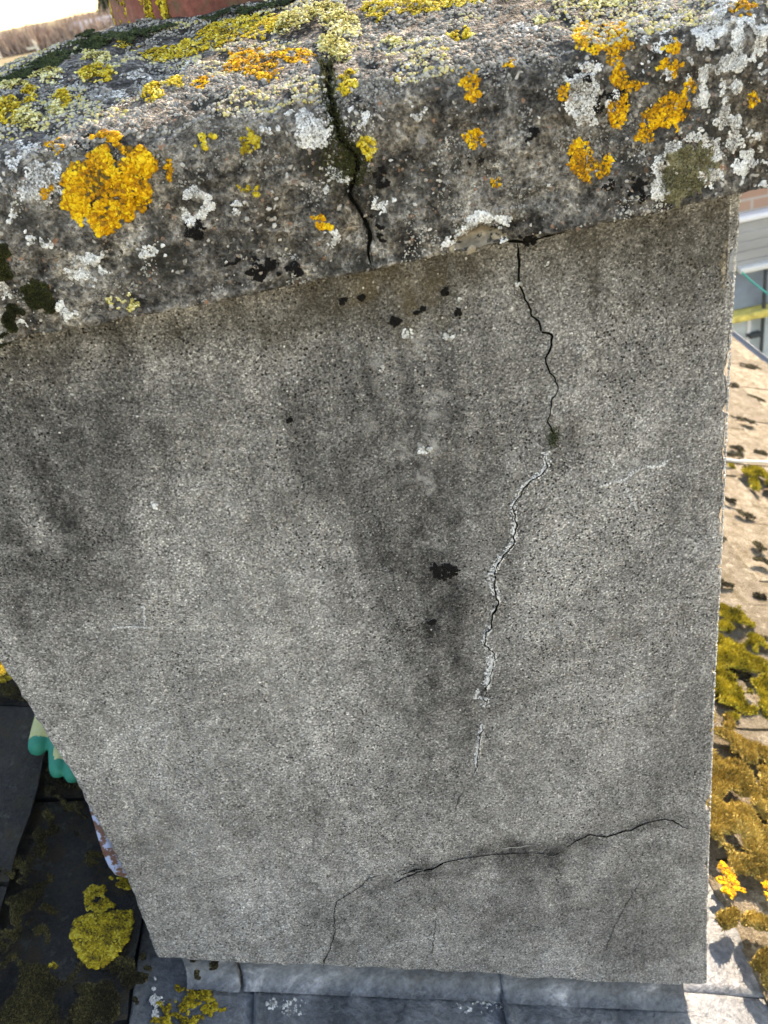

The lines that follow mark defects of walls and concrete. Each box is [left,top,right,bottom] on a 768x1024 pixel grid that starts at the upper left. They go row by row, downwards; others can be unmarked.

crack [312,56,378,267]
crack [455,232,565,811]
crack [323,819,690,966]